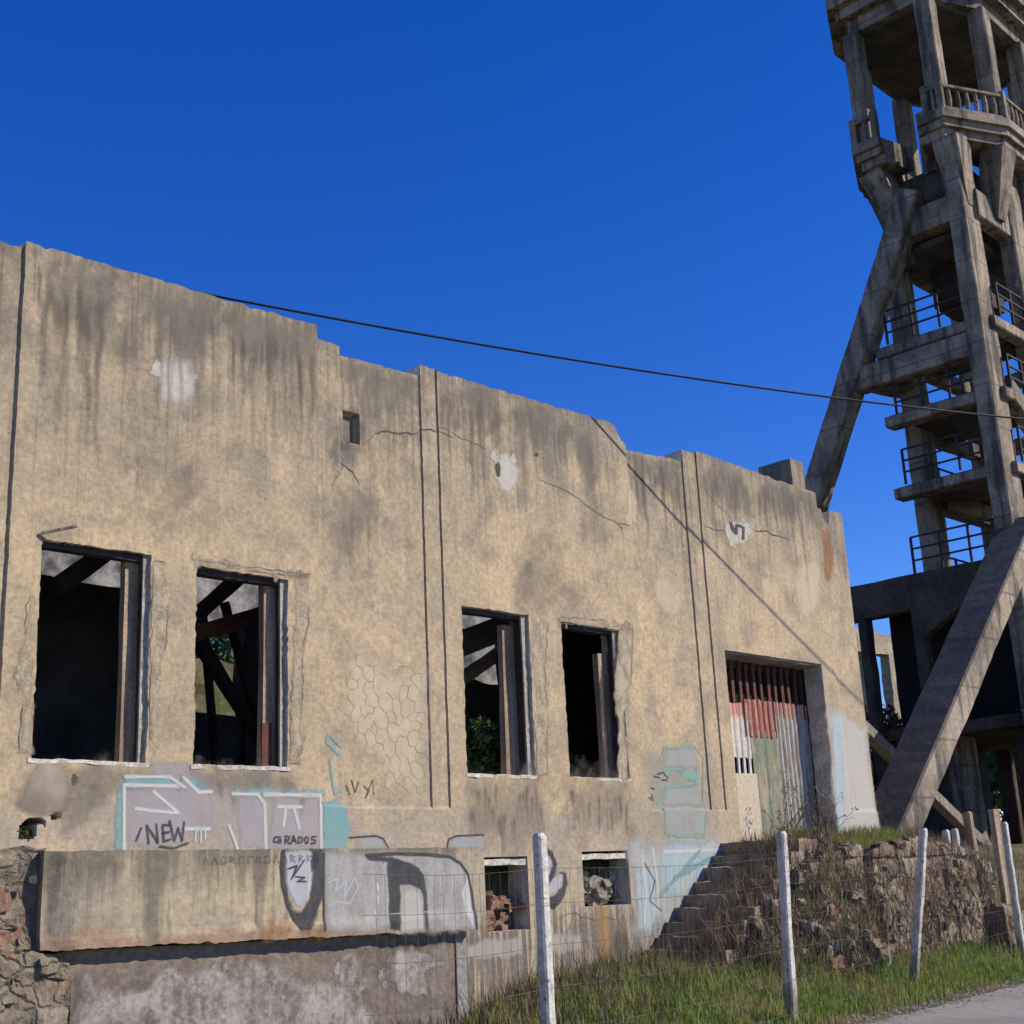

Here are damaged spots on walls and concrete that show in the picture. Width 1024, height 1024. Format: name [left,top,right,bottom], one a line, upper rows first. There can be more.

spalling [150,354,199,410]
crack [367,427,485,449]
spalling [491,448,519,491]
crack [538,479,630,532]
spalling [725,519,753,548]
corrosion [824,533,832,579]
crack [345,640,428,790]